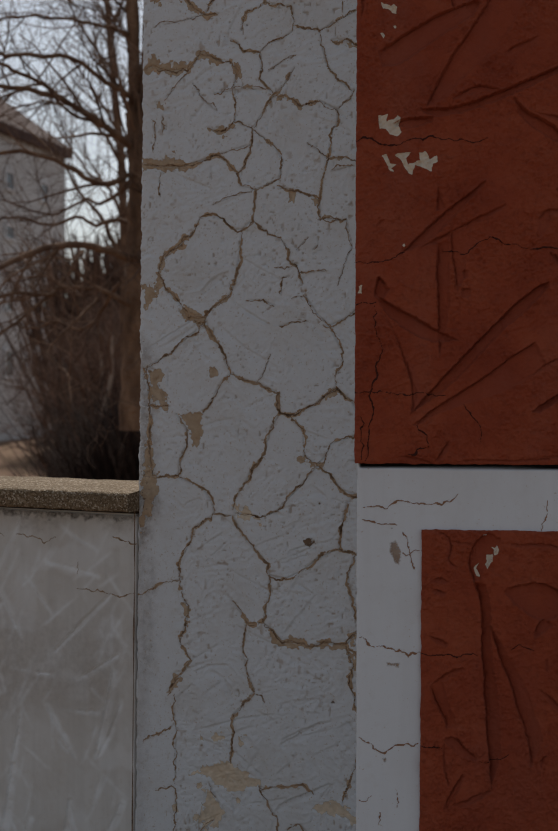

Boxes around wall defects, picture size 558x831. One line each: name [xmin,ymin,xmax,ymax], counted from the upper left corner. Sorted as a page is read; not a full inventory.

spalling [378,114,401,136]
spalling [382,151,438,175]
peeling [147,368,171,411]
peeling [178,411,204,447]
crack [77,0,485,831]
peeling [138,441,160,533]
spalling [474,546,499,577]
peeling [188,761,261,831]